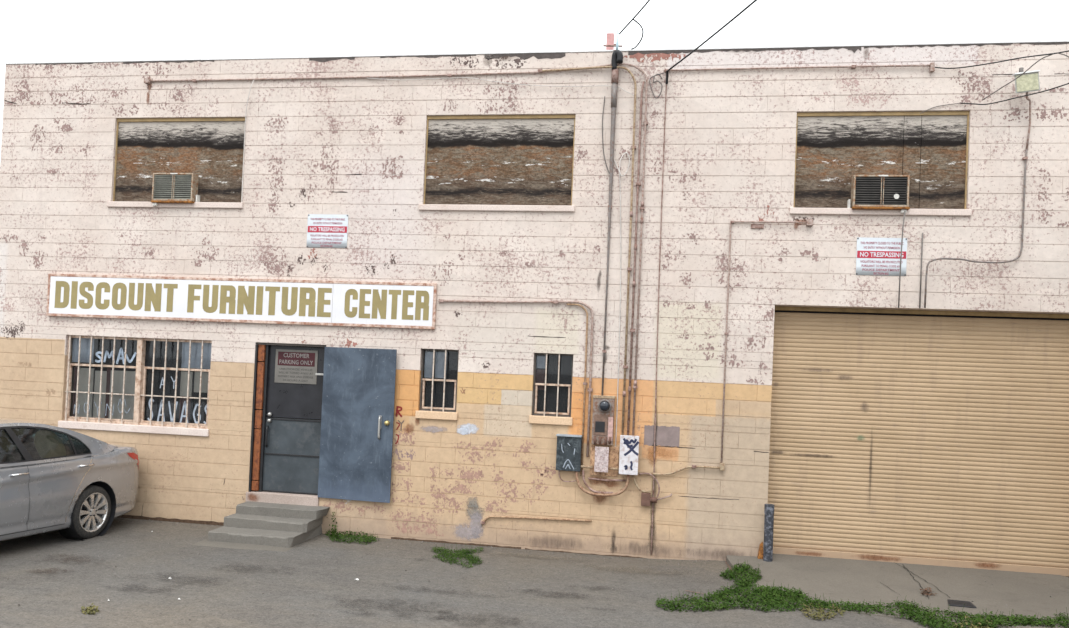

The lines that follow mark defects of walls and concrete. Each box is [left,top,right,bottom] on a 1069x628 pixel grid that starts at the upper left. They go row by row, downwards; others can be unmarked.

peeling [4,62,193,154]
peeling [450,55,525,113]
peeling [951,70,995,107]
peeling [264,114,340,217]
peeling [1037,168,1069,227]
peeling [0,234,48,269]
peeling [191,237,219,267]
peeling [260,244,328,276]
peeling [662,232,711,310]
peeling [715,250,781,293]
peeling [671,332,767,385]
peeling [321,428,642,558]